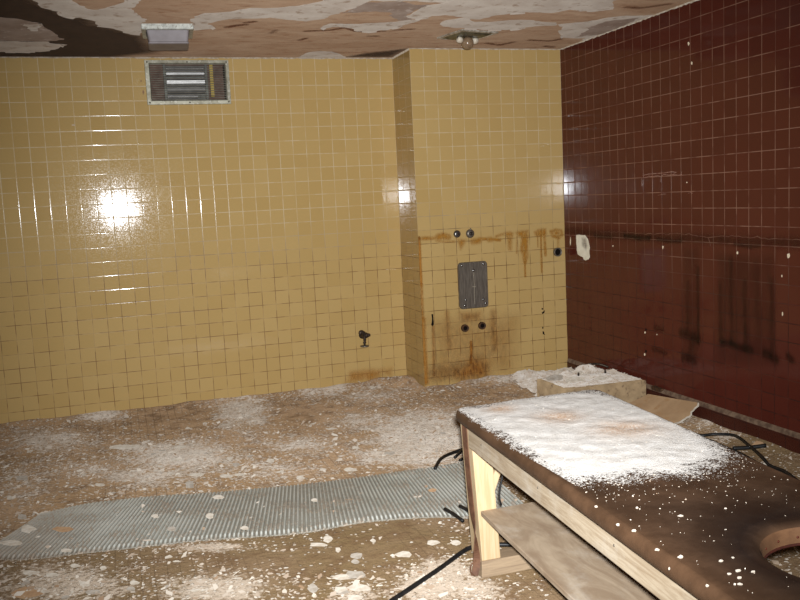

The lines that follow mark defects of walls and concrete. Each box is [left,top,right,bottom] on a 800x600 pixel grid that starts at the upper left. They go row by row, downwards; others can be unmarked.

peeling [0,17,66,53]
peeling [33,0,147,36]
peeling [190,0,653,41]
peeling [298,51,346,59]
rust [460,229,563,277]
rust [418,233,449,385]
rust [462,341,485,378]